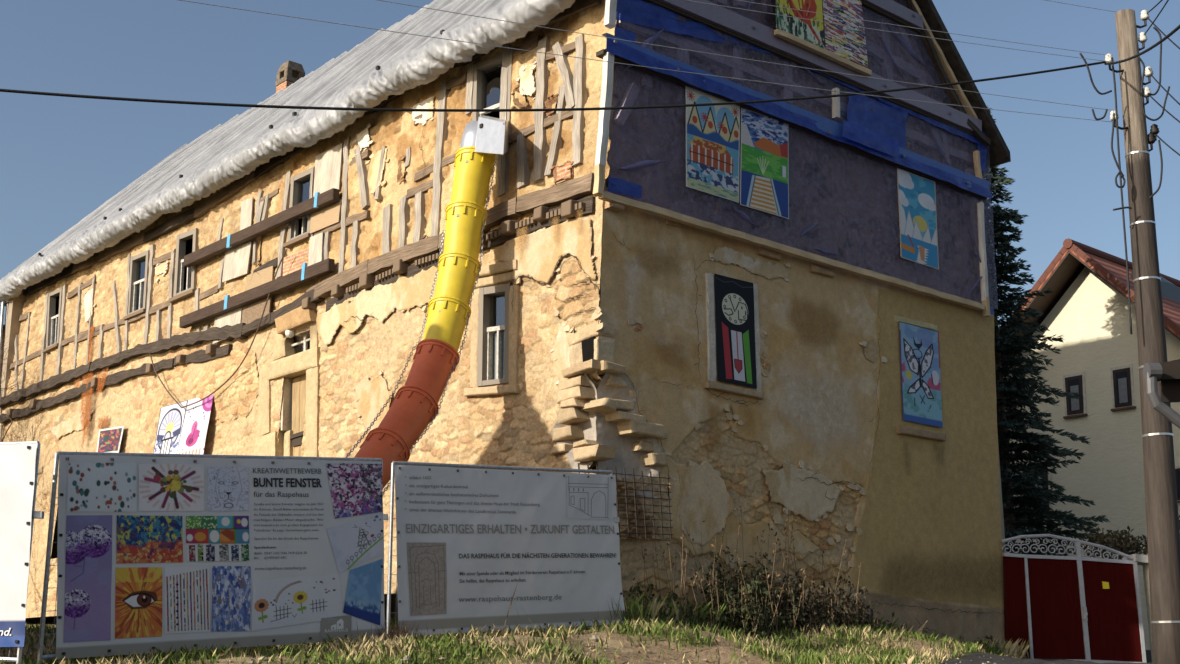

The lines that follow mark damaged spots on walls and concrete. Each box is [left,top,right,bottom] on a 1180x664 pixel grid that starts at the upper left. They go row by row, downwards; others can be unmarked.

flaking render [316,266,439,345]
spalling [493,217,866,614]